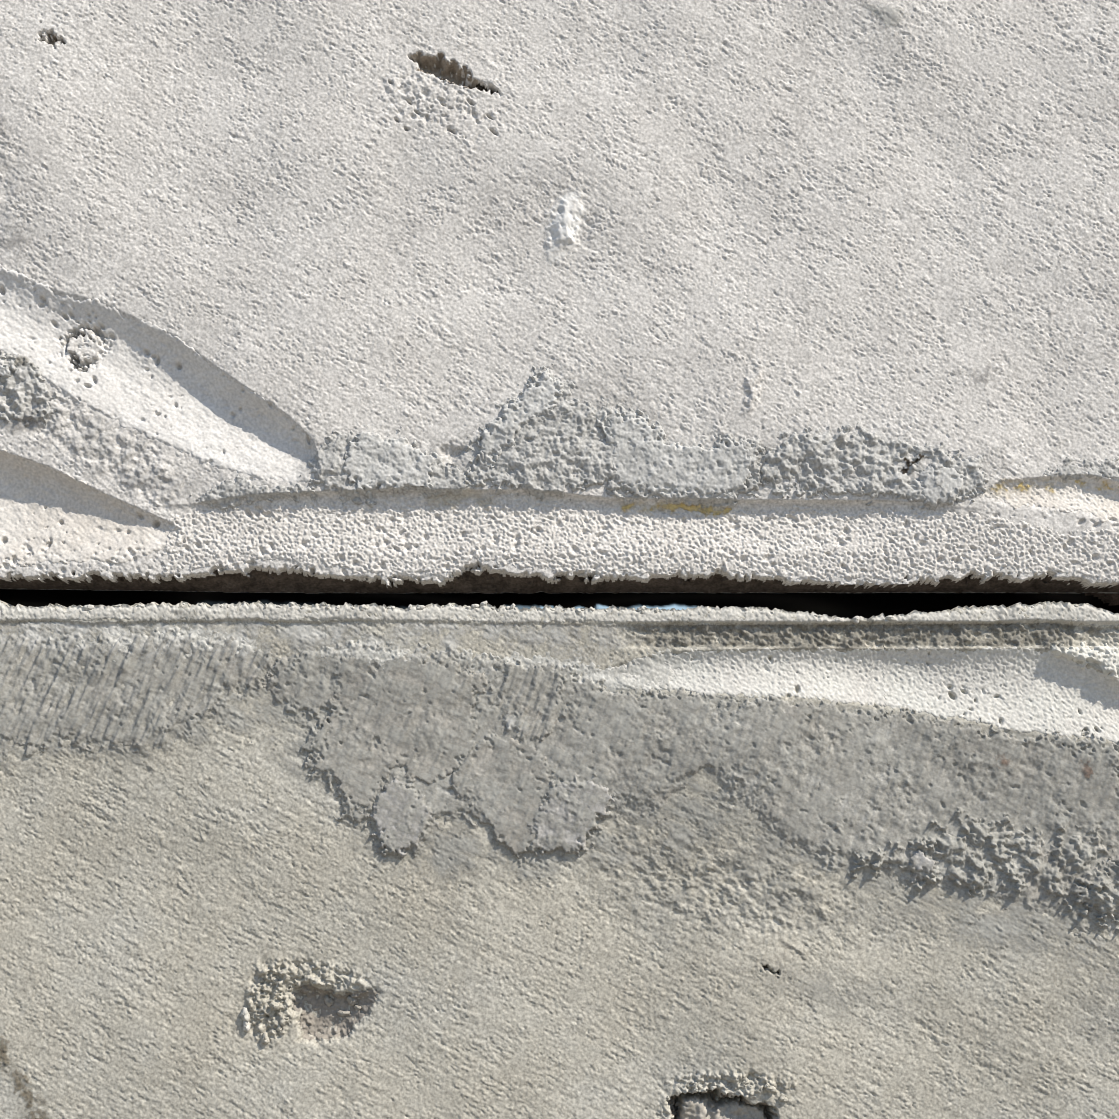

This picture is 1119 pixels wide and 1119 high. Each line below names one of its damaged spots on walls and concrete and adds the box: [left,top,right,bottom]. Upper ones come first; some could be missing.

spalling [411,51,499,95]
peeling [477,370,566,468]
spalling [162,410,1119,593]
crack [0,589,1119,619]
spalling [0,601,1119,628]
spalling [1044,641,1119,680]
peeling [313,656,615,858]
peeling [909,850,939,883]
spalling [240,974,380,1045]
spalling [666,1078,788,1119]